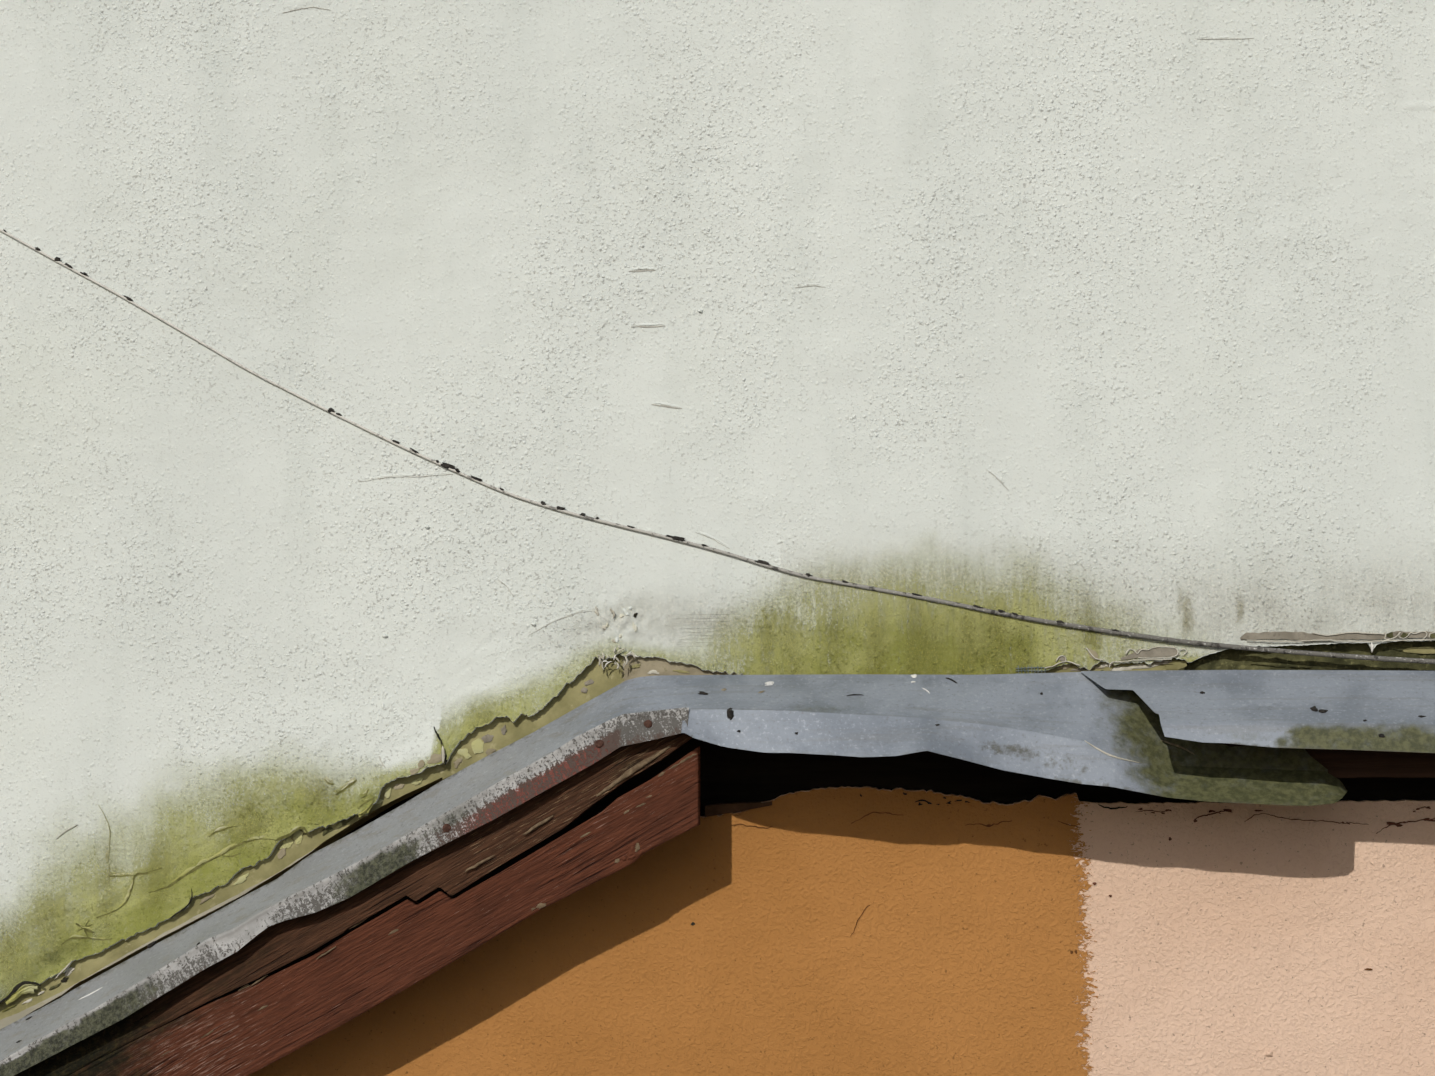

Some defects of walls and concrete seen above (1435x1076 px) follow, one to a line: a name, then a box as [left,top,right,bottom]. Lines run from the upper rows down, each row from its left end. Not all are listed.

spalling [1045,631,1435,671]
crack [324,756,385,817]
crack [58,806,308,945]